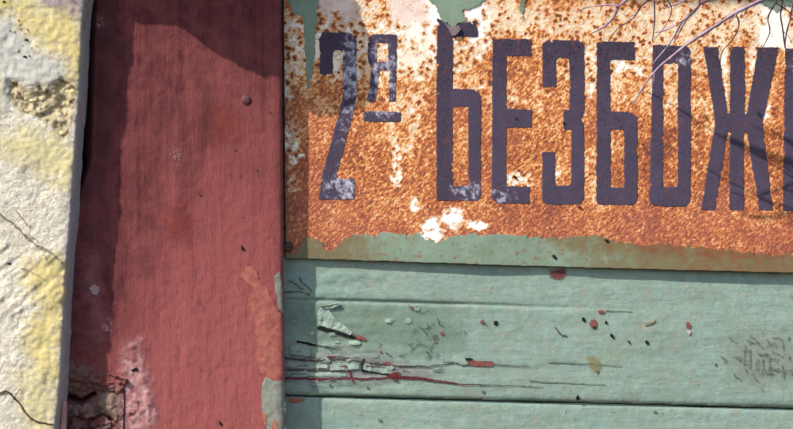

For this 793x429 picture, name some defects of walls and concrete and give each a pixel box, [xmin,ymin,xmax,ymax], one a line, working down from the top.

corrosion [550,269,566,279]
peeling [240,266,454,429]
crack [0,389,54,425]